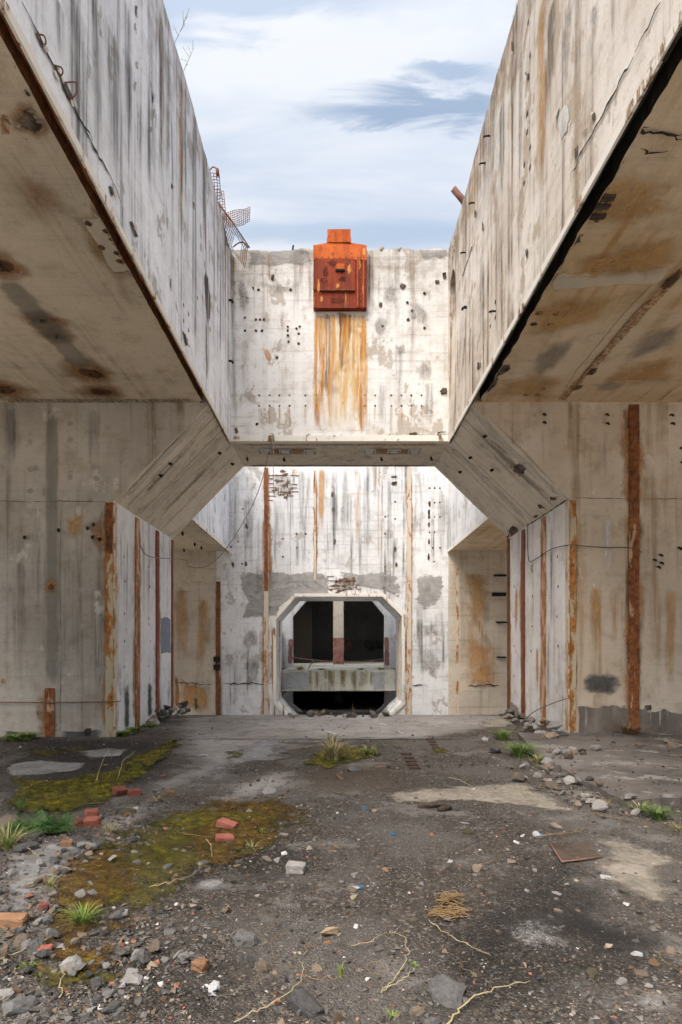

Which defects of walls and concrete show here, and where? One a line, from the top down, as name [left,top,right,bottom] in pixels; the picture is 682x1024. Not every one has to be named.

crack [570,3,660,175]
crack [640,126,682,155]
corrosion [314,313,367,427]